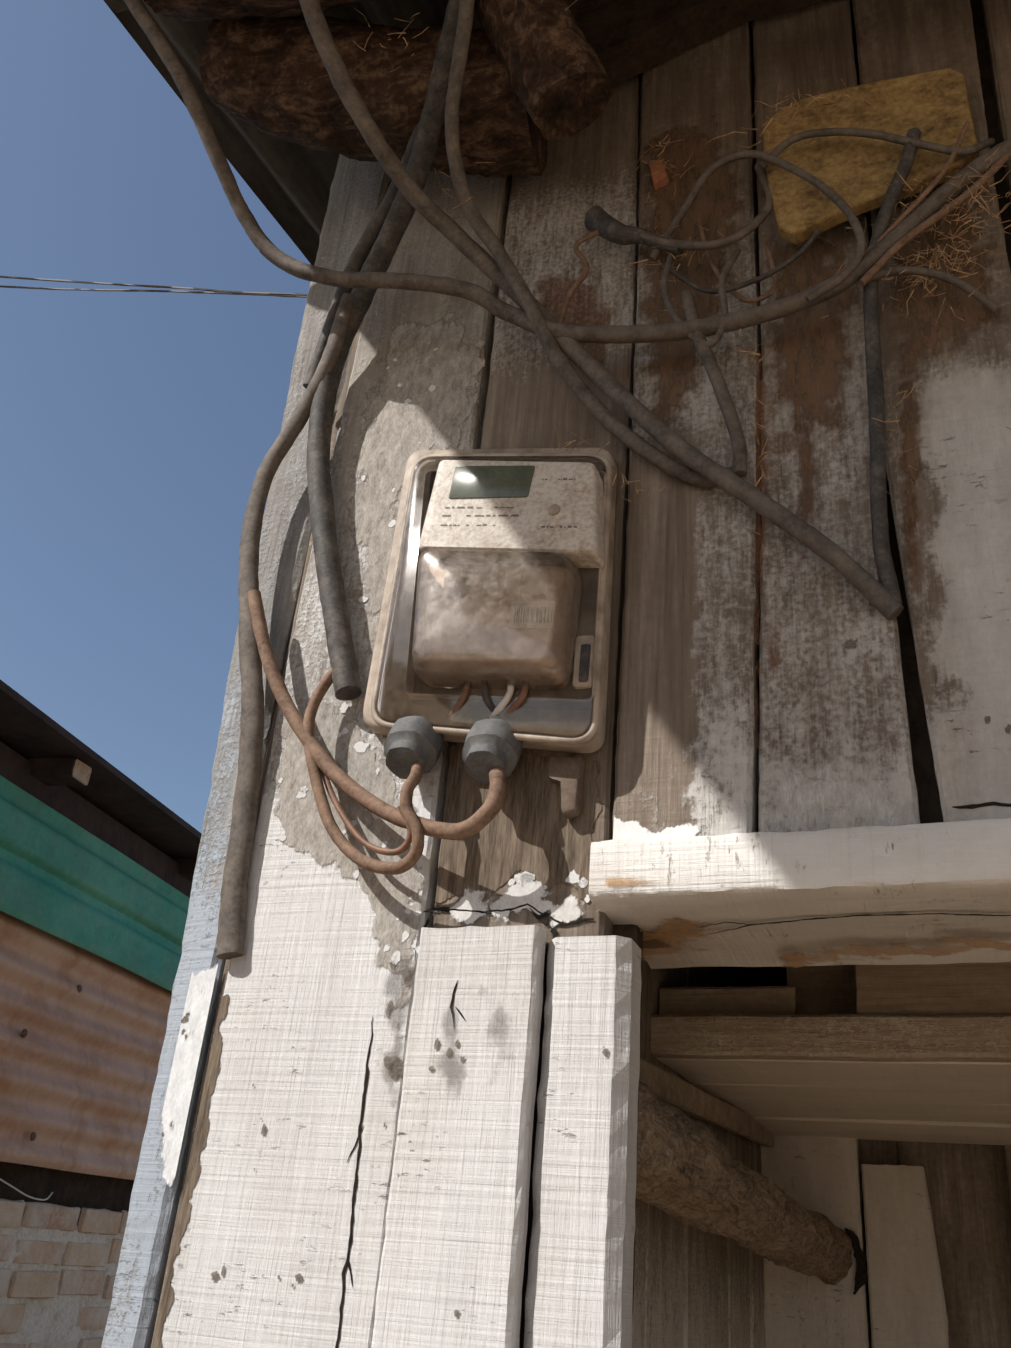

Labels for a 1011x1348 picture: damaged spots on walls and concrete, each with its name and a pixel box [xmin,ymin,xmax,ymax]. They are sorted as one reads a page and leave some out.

water stain [638,126,741,325]
water stain [766,239,845,300]
water stain [643,339,697,425]
water stain [765,288,857,520]
peeling [273,702,700,1082]
crack [449,980,466,1029]
crack [335,1017,373,1348]